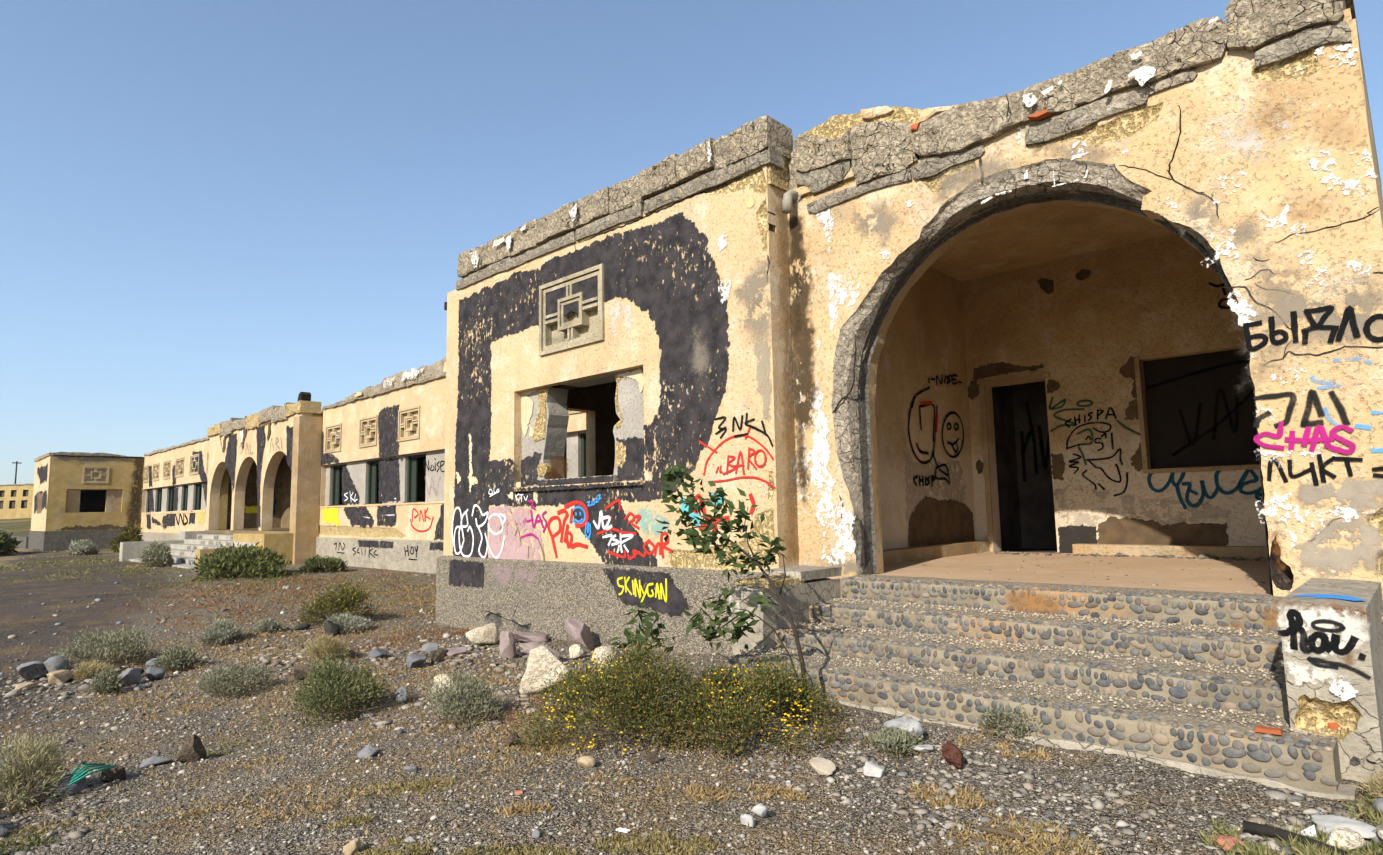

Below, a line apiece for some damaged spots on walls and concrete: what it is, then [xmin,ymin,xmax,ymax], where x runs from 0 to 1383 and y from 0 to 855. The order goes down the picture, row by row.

peeling [1022,80,1062,107]
peeling [1104,51,1156,94]
crack [1075,105,1219,219]
peeling [1260,205,1306,236]
peeling [1307,149,1377,199]
spalling [669,101,1262,575]
crack [1223,207,1383,366]
spalling [904,439,1383,741]